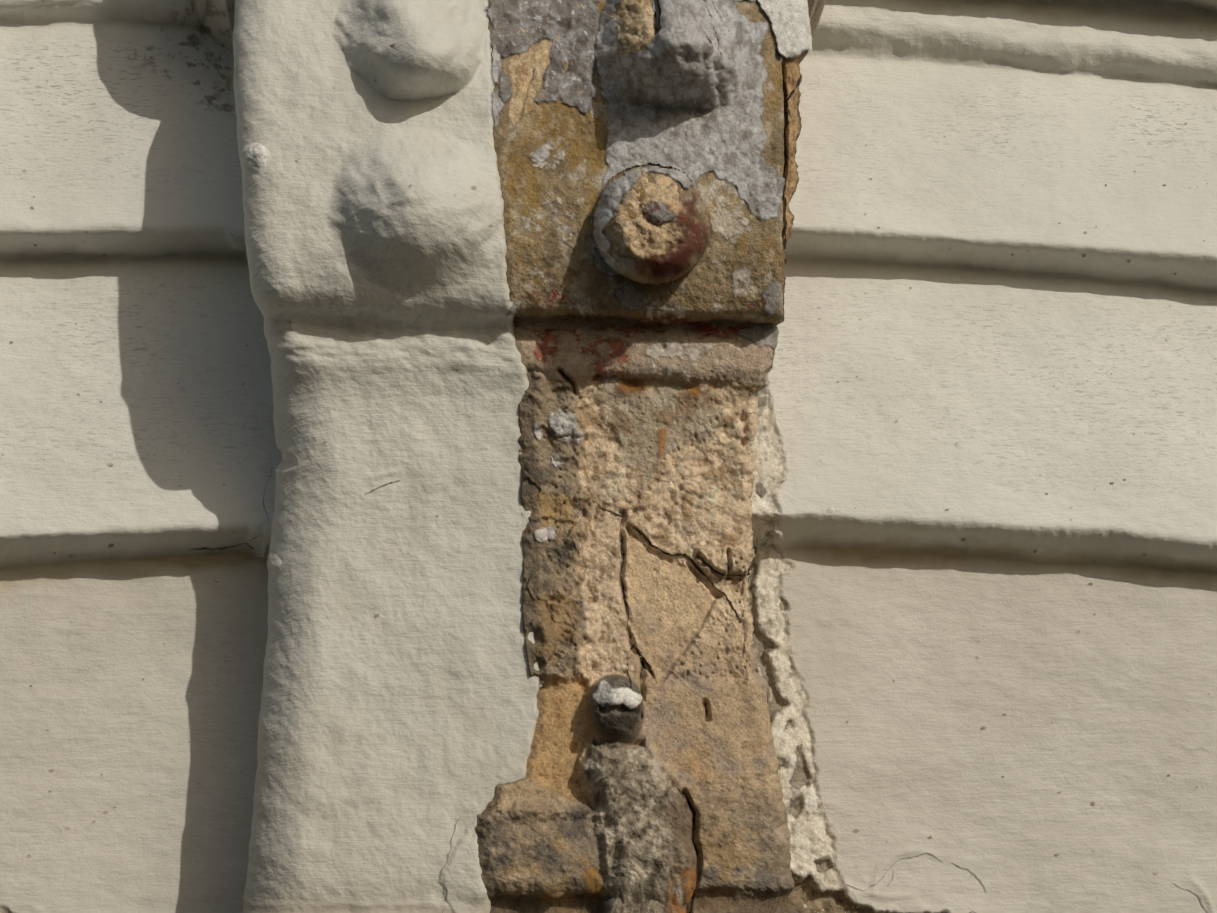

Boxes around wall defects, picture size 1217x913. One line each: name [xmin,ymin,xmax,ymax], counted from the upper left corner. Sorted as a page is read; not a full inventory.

corrosion [641,193,710,279]
flaking render [474,0,874,913]
crack [597,504,752,702]
crack [678,788,698,913]